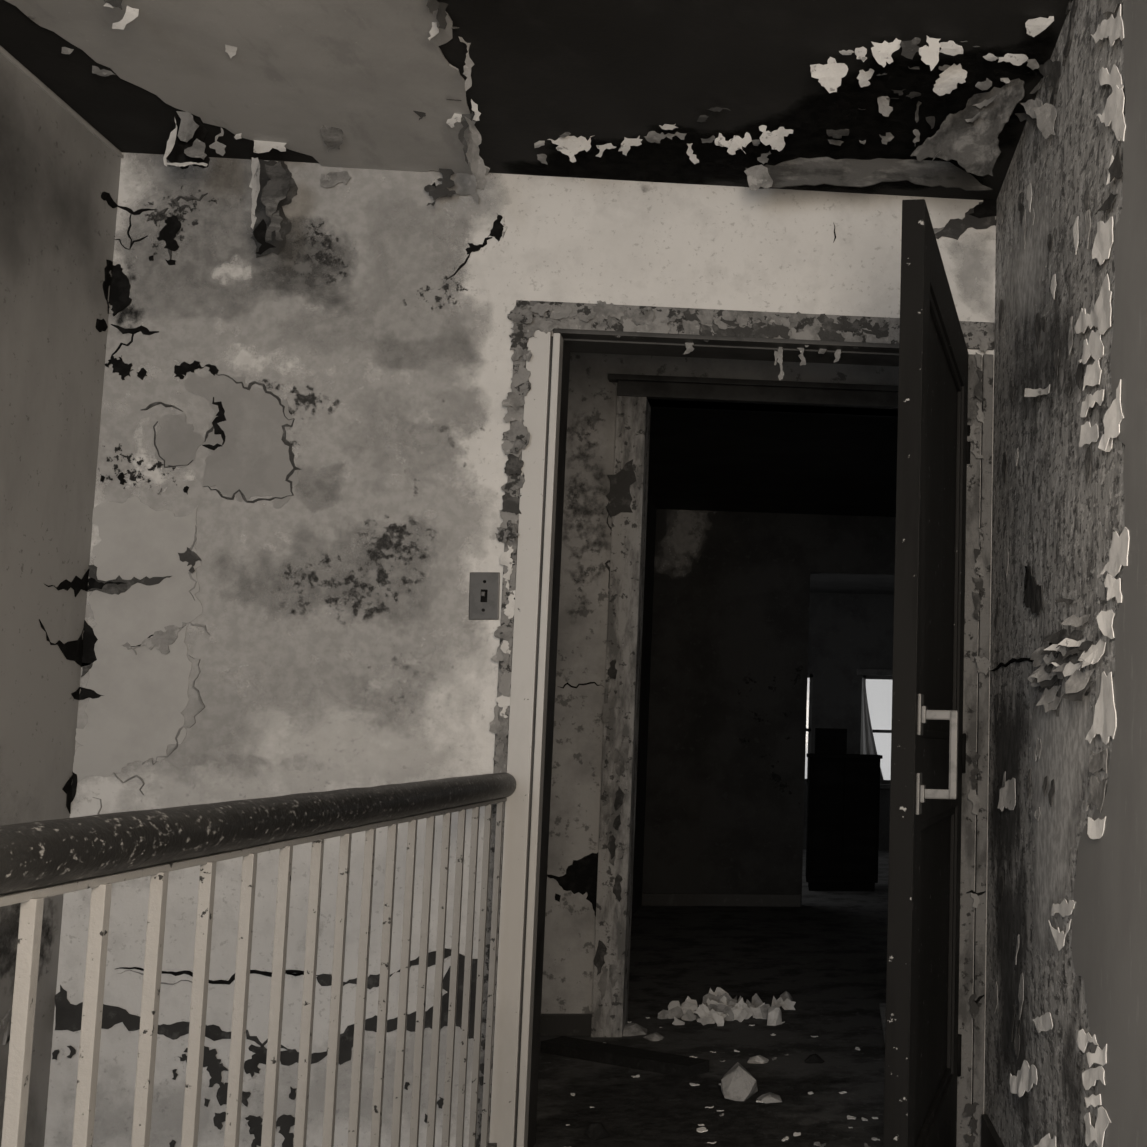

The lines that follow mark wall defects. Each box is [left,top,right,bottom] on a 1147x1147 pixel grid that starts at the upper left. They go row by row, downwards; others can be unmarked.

crack [446,215,508,280]
peeling [534,124,793,165]
damp [508,32,1055,185]
damp [799,180,929,191]
flaking render [810,0,1078,176]
crack [202,397,226,450]
damp [97,153,496,769]
crack [39,565,210,700]
peeling [62,496,205,814]
peeling [1009,0,1147,1147]
damp [991,685,1095,1076]
flaking render [244,948,478,1077]